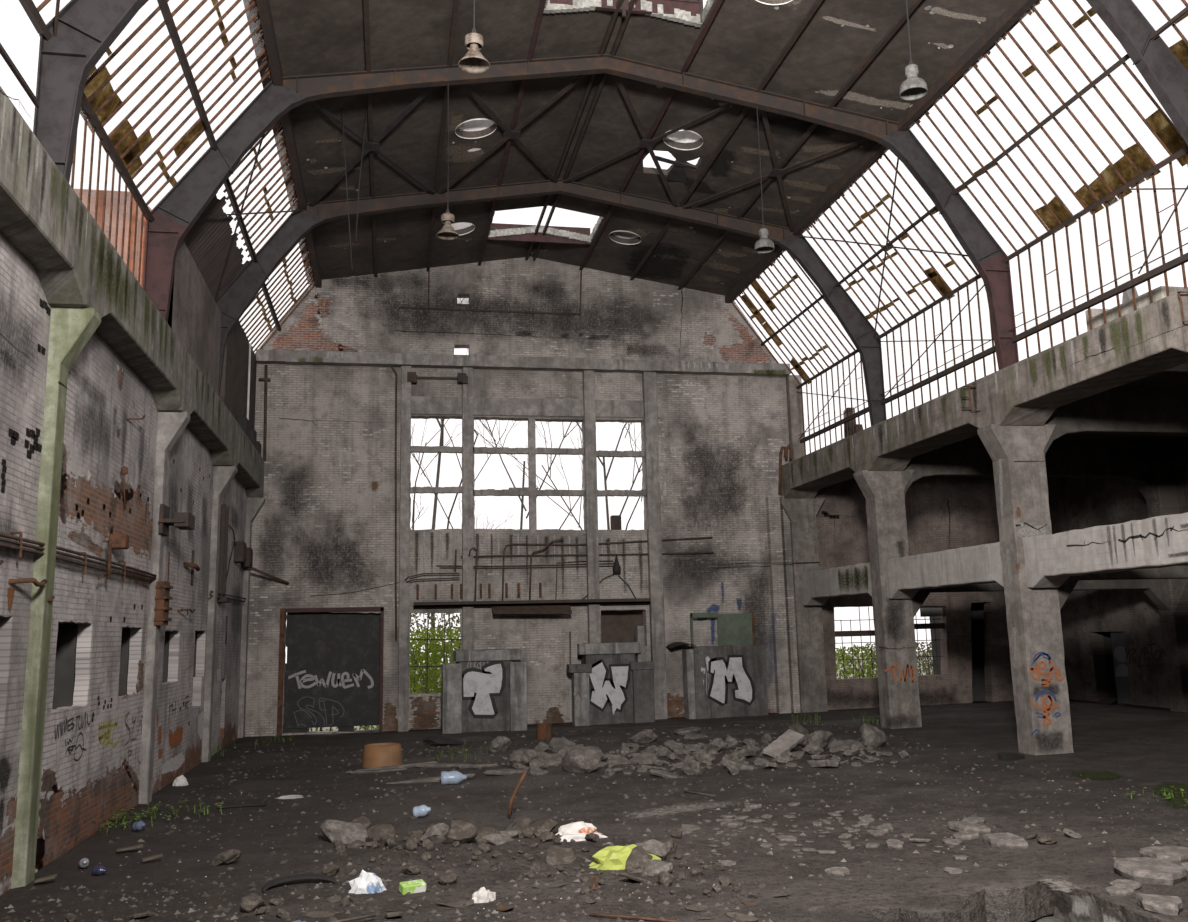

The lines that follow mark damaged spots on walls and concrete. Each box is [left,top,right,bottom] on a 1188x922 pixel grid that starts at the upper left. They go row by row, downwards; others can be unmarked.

damp [0,95,46,199]
damp [61,180,137,321]
peeling [269,294,362,352]
peeling [701,309,770,363]
damp [82,393,150,502]
peeling [59,441,153,590]
peeling [0,792,18,882]
peeling [35,753,139,873]